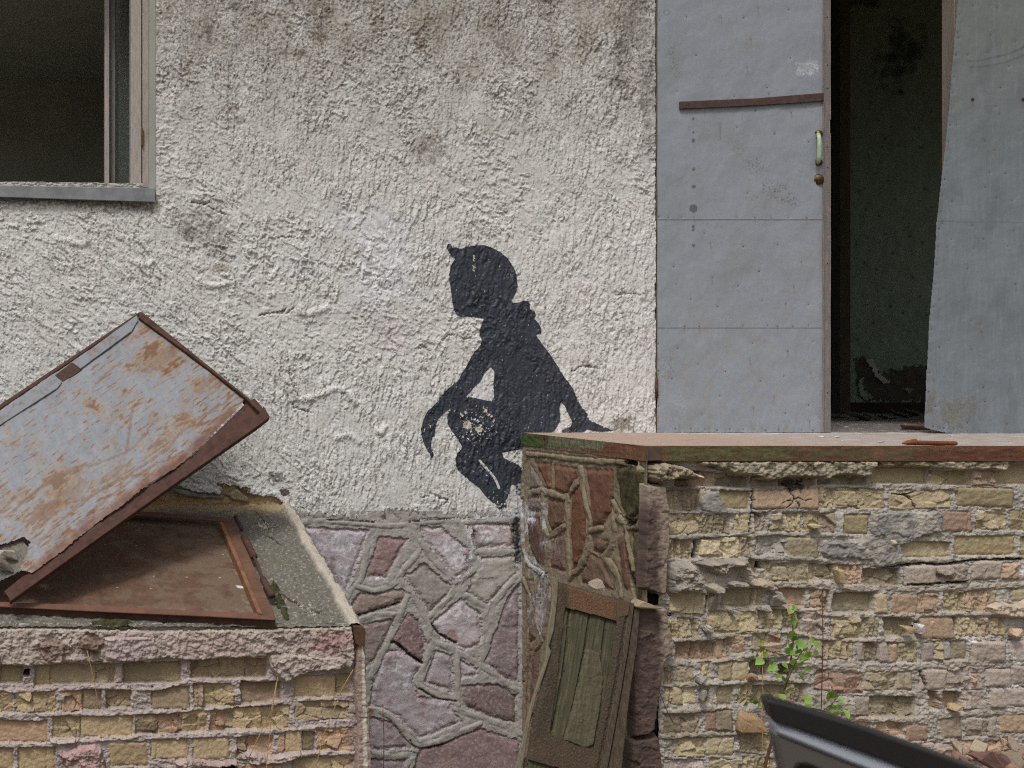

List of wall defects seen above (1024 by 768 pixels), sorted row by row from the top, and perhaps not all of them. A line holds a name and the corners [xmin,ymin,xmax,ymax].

spalling [637,461,1012,506]
rust [0,516,253,613]
spalling [697,537,739,555]
spalling [701,566,804,637]